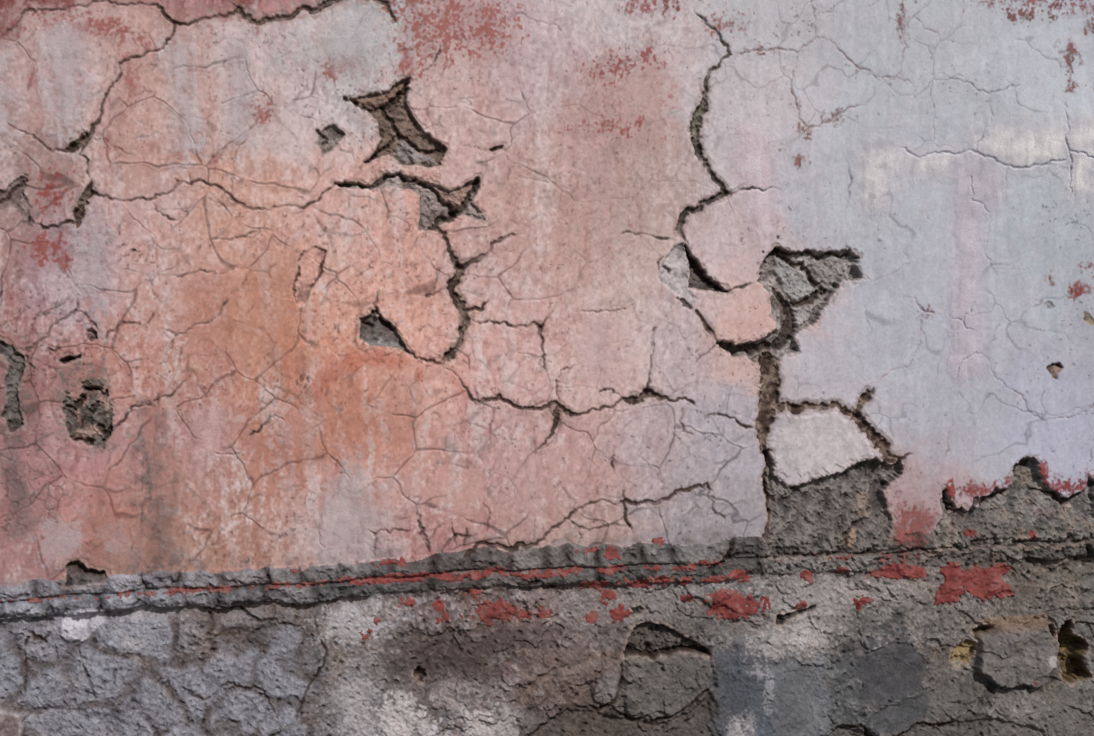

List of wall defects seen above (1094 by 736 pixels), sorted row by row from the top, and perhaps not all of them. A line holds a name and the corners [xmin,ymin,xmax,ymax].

crack [0,0,400,278]
flaking render [334,77,485,231]
crack [620,0,977,243]
flaking render [62,387,115,452]
crack [22,294,228,374]
peeling [657,242,730,309]
crack [367,227,1094,590]
flaking render [716,247,862,367]
crack [182,565,328,736]
spalling [0,545,771,660]
crack [526,658,711,736]
flaking render [762,451,1094,605]